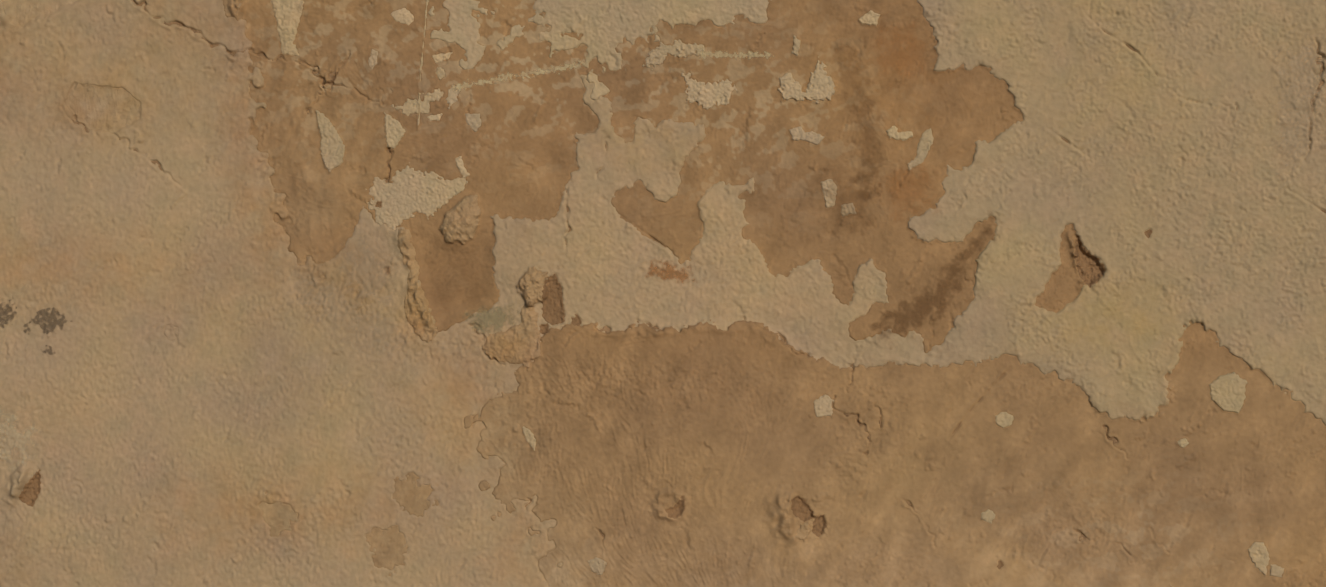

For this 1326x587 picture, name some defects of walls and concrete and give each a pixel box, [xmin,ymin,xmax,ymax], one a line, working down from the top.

crack [71,115,162,171]
crack [133,0,383,114]
crack [417,0,429,125]
spalling [239,0,1023,353]
crack [1305,44,1323,160]
peeling [1035,224,1105,313]
spalling [464,319,1326,587]
peeling [366,472,439,576]